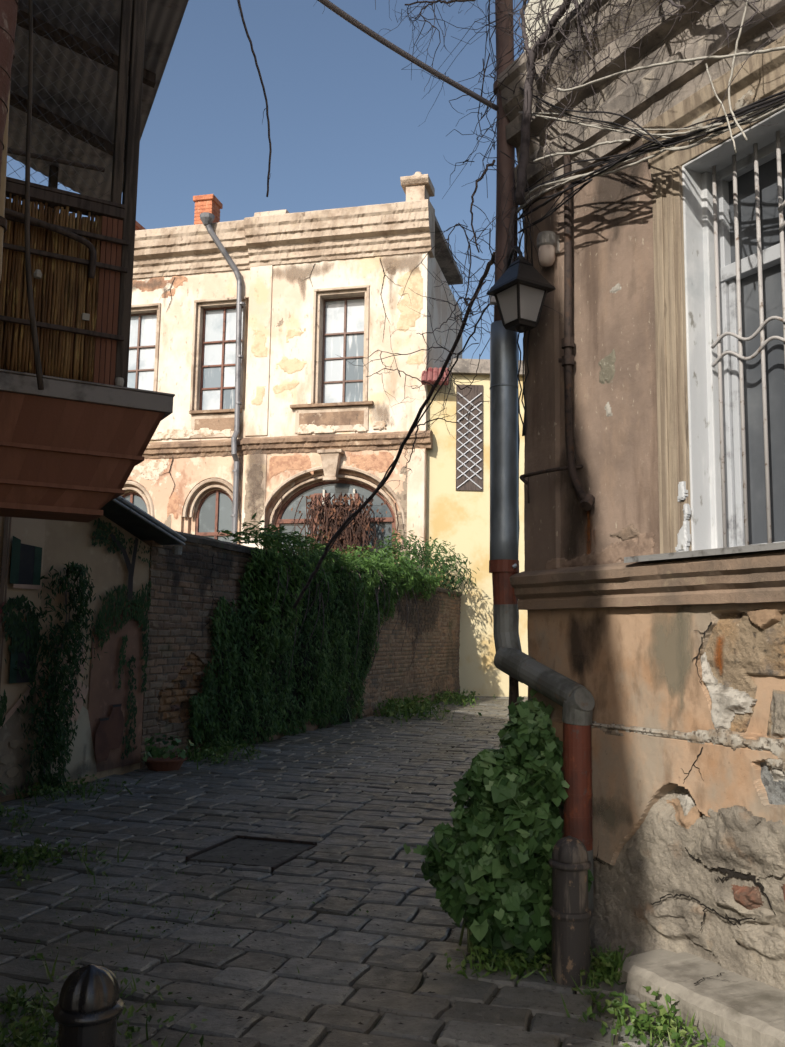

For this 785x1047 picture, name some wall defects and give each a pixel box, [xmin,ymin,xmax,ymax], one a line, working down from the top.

flaking render [132,275,188,298]
flaking render [276,318,306,343]
flaking render [251,329,307,406]
leakage [570,618,602,672]
leakage [653,613,692,692]
crack [692,622,712,684]
flaking render [591,608,785,805]
crack [682,747,704,782]
flaking render [589,786,785,991]